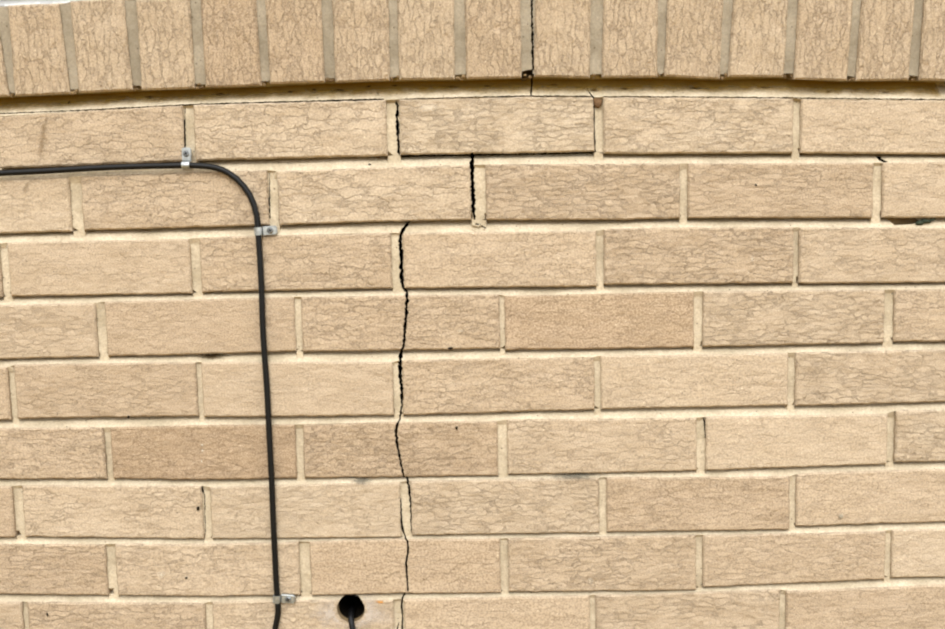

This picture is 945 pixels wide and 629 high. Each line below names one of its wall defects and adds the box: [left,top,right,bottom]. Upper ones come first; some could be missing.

crack [394,221,412,629]